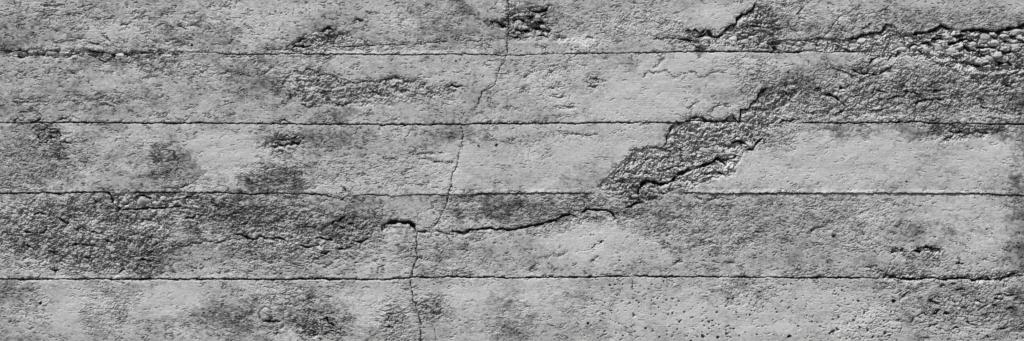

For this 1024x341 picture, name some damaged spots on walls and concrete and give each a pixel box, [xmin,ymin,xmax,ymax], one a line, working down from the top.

crack [332,40,482,48]
crack [381,4,626,341]
peeling [490,6,565,40]
spalling [595,2,1024,210]